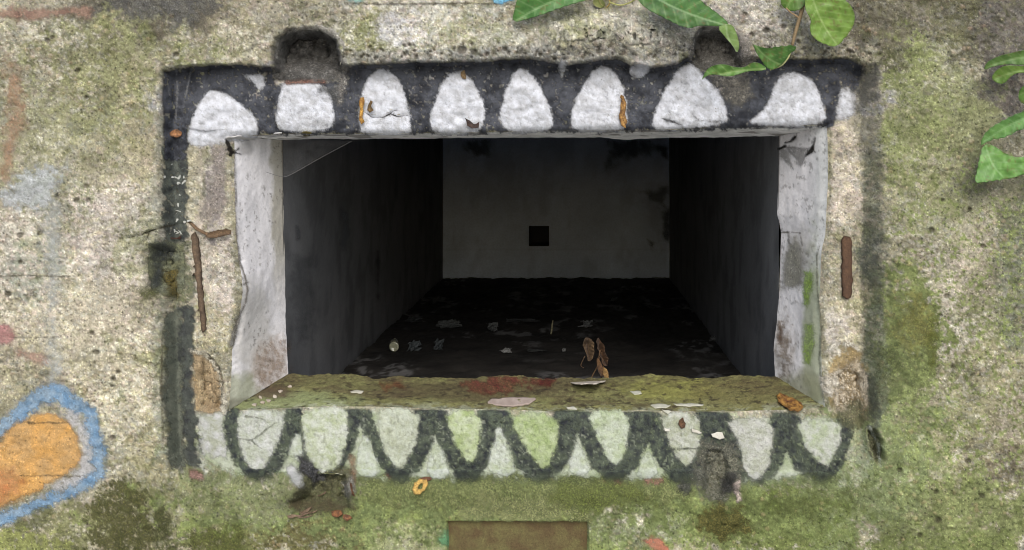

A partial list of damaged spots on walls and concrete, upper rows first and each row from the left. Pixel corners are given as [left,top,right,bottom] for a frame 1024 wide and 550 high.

spalling [273,24,348,103]
spalling [689,26,754,106]
rust [191,232,207,333]
rust [841,236,853,299]
spalling [193,351,228,414]
water stain [867,343,903,418]